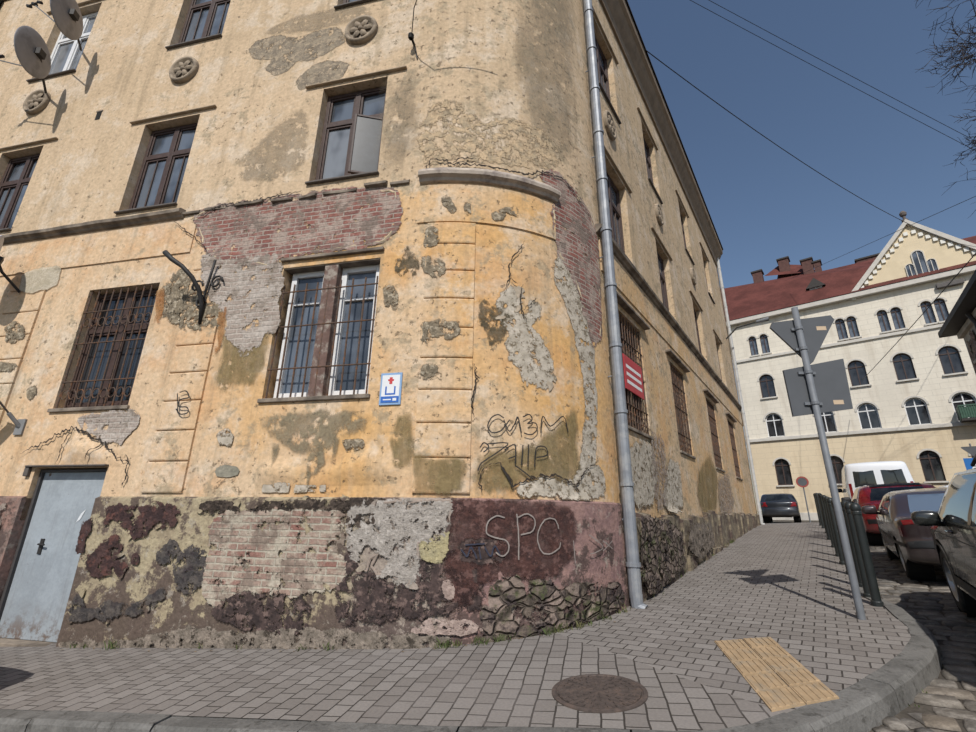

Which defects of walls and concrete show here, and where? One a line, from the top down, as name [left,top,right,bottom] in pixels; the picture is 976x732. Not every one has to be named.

flaking render [249,27,349,90]
spalling [155,186,404,357]
spalling [417,99,606,501]
crack [505,244,536,321]
crack [25,426,129,485]
peeling [77,408,140,445]
spalling [65,482,455,626]
damp [210,588,311,636]
flaking render [58,571,625,649]